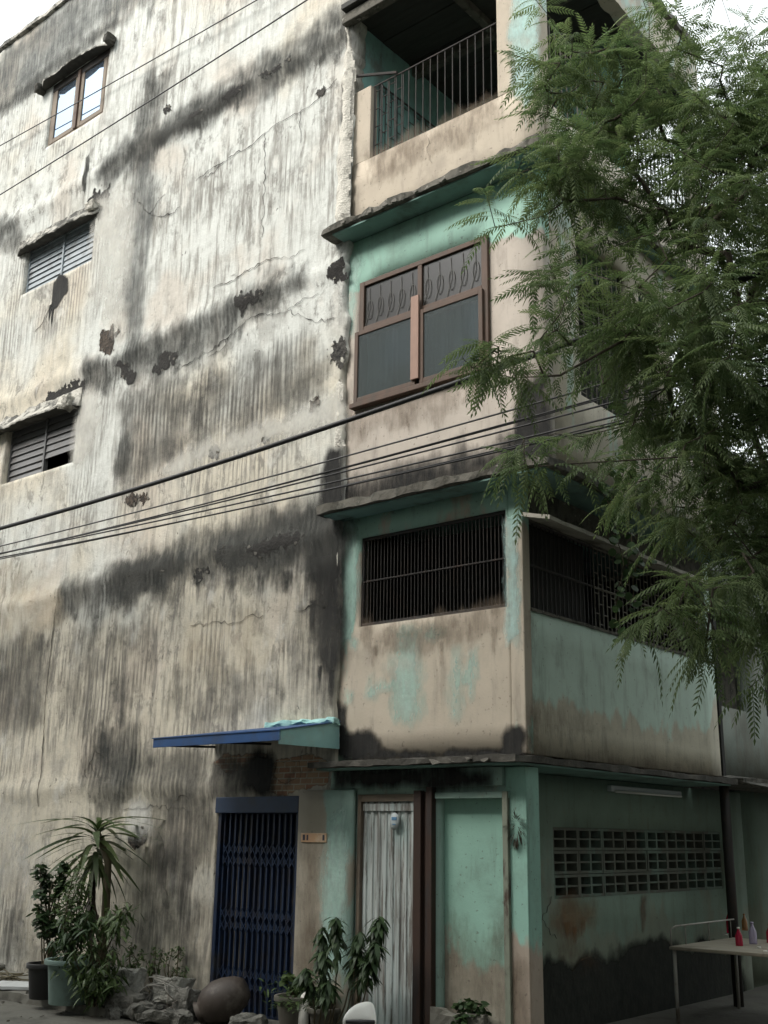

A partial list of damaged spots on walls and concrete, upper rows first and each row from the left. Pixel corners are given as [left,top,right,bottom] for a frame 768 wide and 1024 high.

crack [200,83,333,285]
water stain [82,11,355,484]
spalling [234,289,263,317]
spalling [326,256,361,325]
spalling [99,324,136,385]
spalling [327,335,347,369]
flaking render [42,379,97,462]
spalling [124,492,150,510]
water stain [56,377,553,791]
water stain [0,637,48,729]
water stain [83,728,275,880]
water stain [543,898,746,1024]